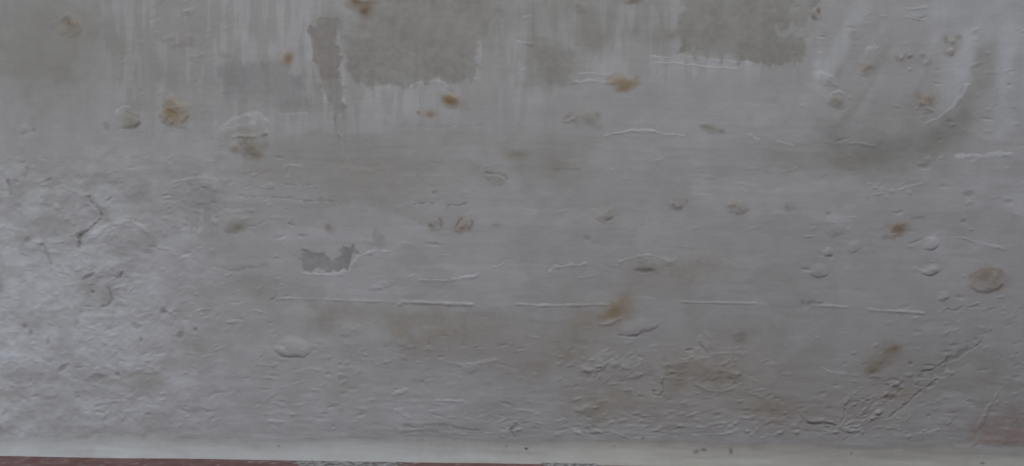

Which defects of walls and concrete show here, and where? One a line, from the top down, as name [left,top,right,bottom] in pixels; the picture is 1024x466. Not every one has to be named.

rust [113,89,198,133]
rust [433,89,472,112]
rust [603,70,645,95]
crack [74,194,105,250]
crack [100,271,124,308]
peeling [291,242,393,279]
rust [955,258,1016,300]
crack [800,340,984,429]